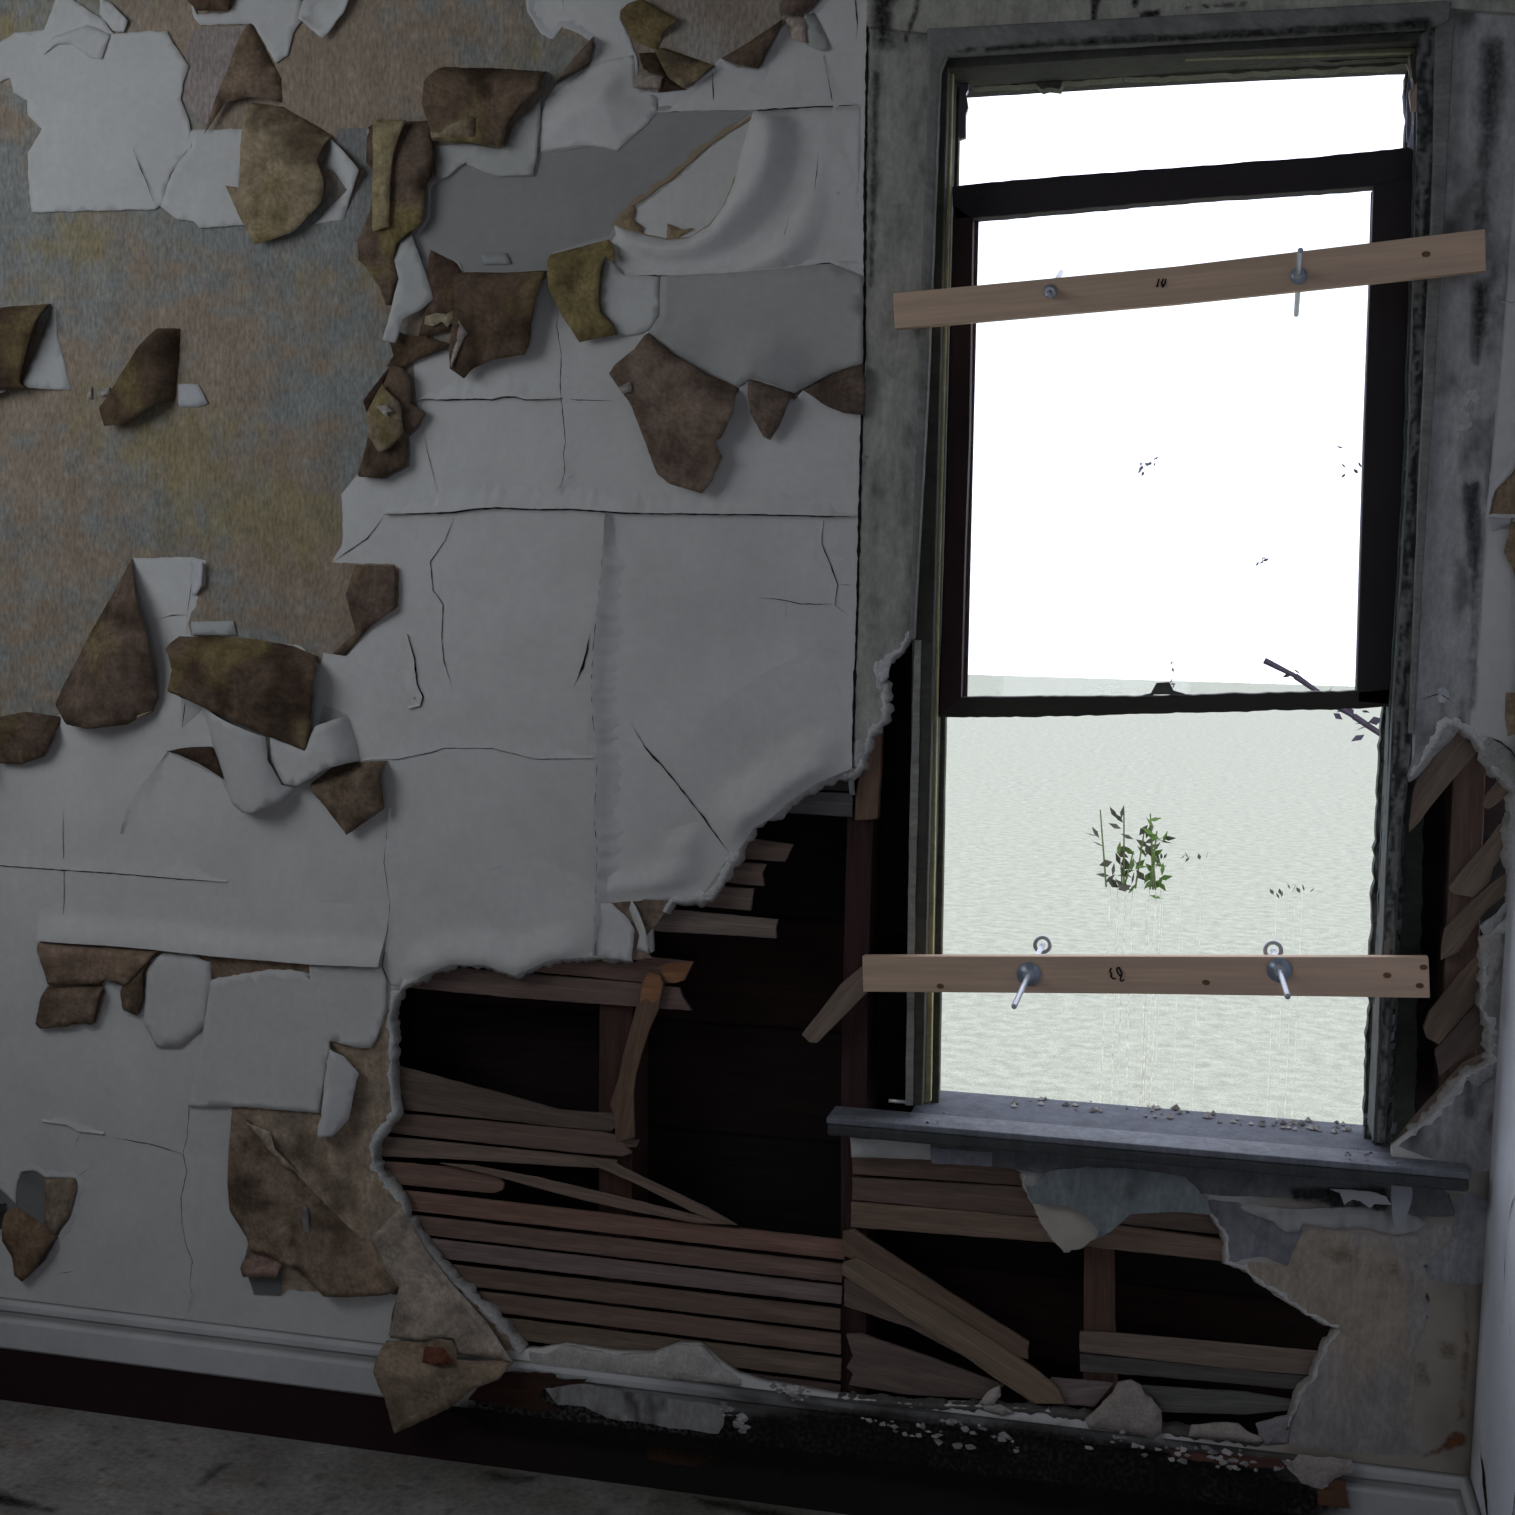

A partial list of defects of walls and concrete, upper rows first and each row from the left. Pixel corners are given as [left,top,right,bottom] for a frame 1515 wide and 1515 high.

crack [622,0,869,378]
water stain [874,0,918,48]
water stain [1132,0,1159,17]
water stain [966,19,1432,51]
peeling [1415,29,1435,237]
water stain [1474,283,1488,356]
crack [334,309,863,956]
spalling [662,631,912,914]
peeling [1363,279,1515,1172]
water stain [1465,482,1479,578]
spalling [369,952,751,1434]
peeling [837,1166,1487,1509]